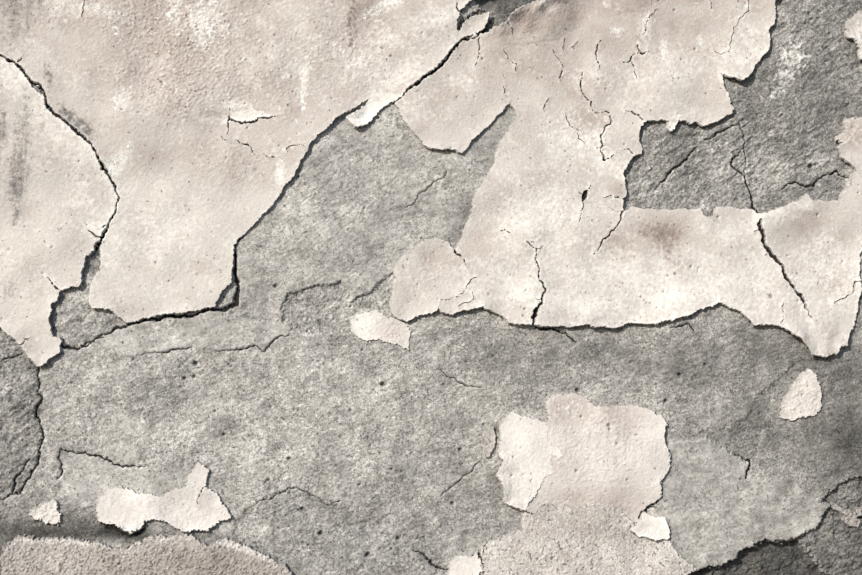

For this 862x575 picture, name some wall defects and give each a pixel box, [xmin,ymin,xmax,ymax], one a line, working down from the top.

crack [0,55,120,251]
peeling [0,0,490,503]
crack [441,250,477,307]
crack [500,229,576,342]
peeling [281,0,862,358]
crack [552,38,638,161]
crack [579,185,622,255]
crack [656,123,813,319]
crack [781,170,849,190]
spalling [699,361,822,463]
peeling [0,392,862,575]